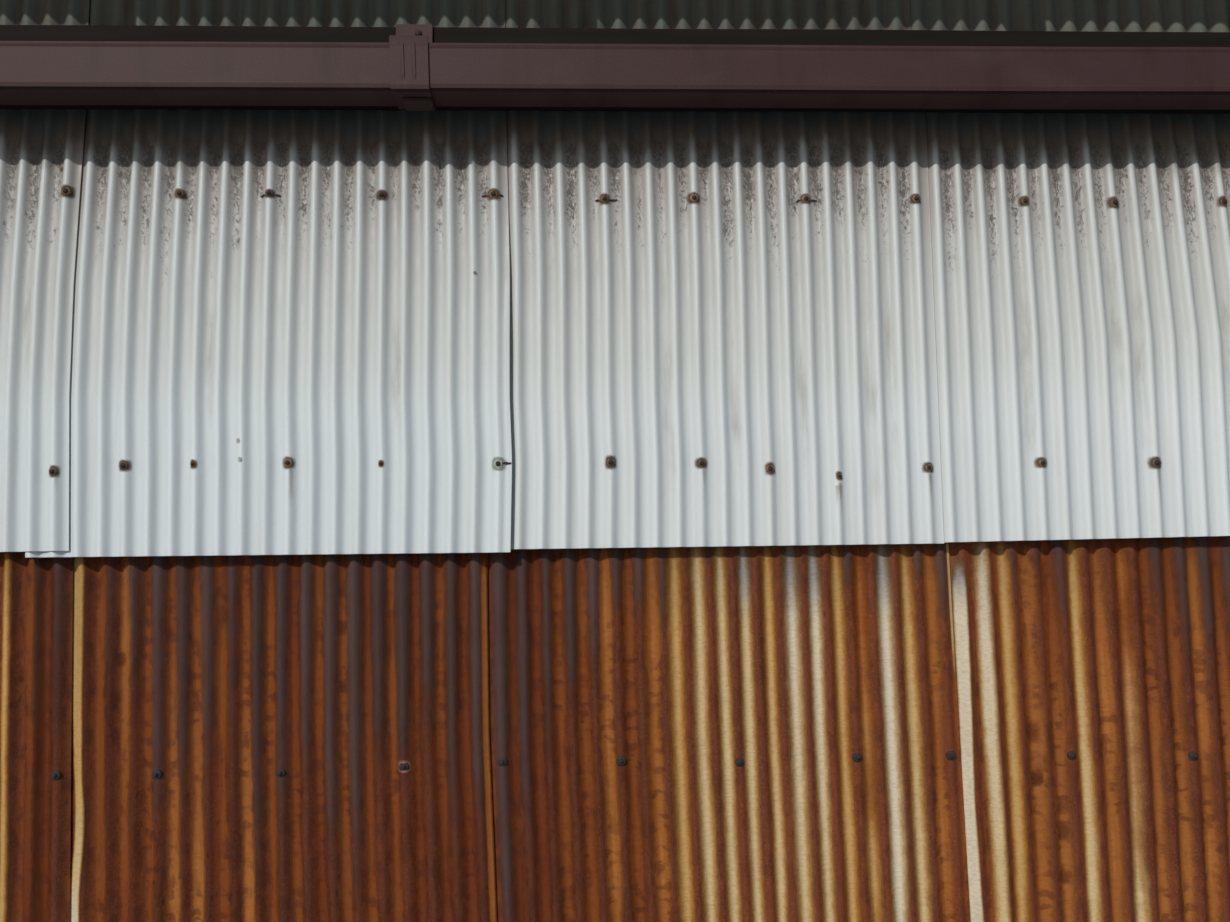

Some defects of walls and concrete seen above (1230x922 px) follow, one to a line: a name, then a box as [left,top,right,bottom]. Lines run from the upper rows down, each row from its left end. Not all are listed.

leakage [8,140,64,242]
leakage [94,139,354,246]
leakage [367,139,488,213]
leakage [520,141,663,232]
leakage [677,141,910,246]
leakage [940,142,1230,256]
rust [0,552,52,922]
rust [93,553,496,922]
rust [510,542,955,922]
rust [974,537,1230,922]